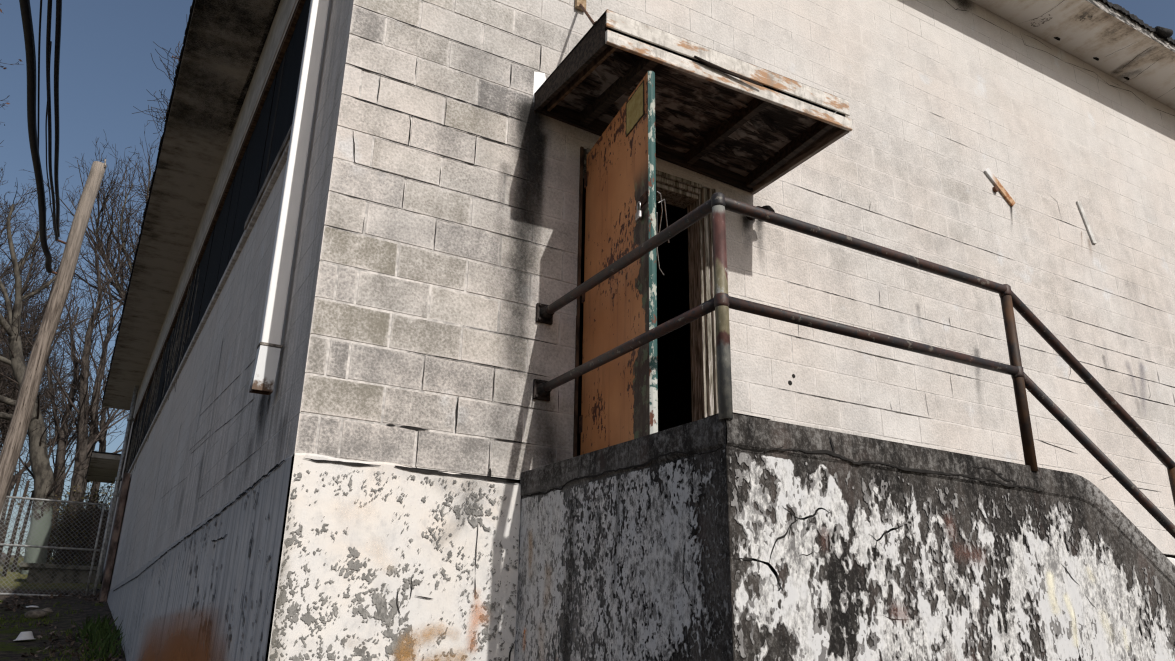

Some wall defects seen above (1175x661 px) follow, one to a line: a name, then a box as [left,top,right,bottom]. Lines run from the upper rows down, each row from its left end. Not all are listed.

leakage [514,103,545,336]
crack [463,325,557,345]
crack [779,325,979,418]
crack [790,282,1175,407]
crack [113,351,1041,606]
crack [396,577,433,613]
peeling [167,449,1175,661]